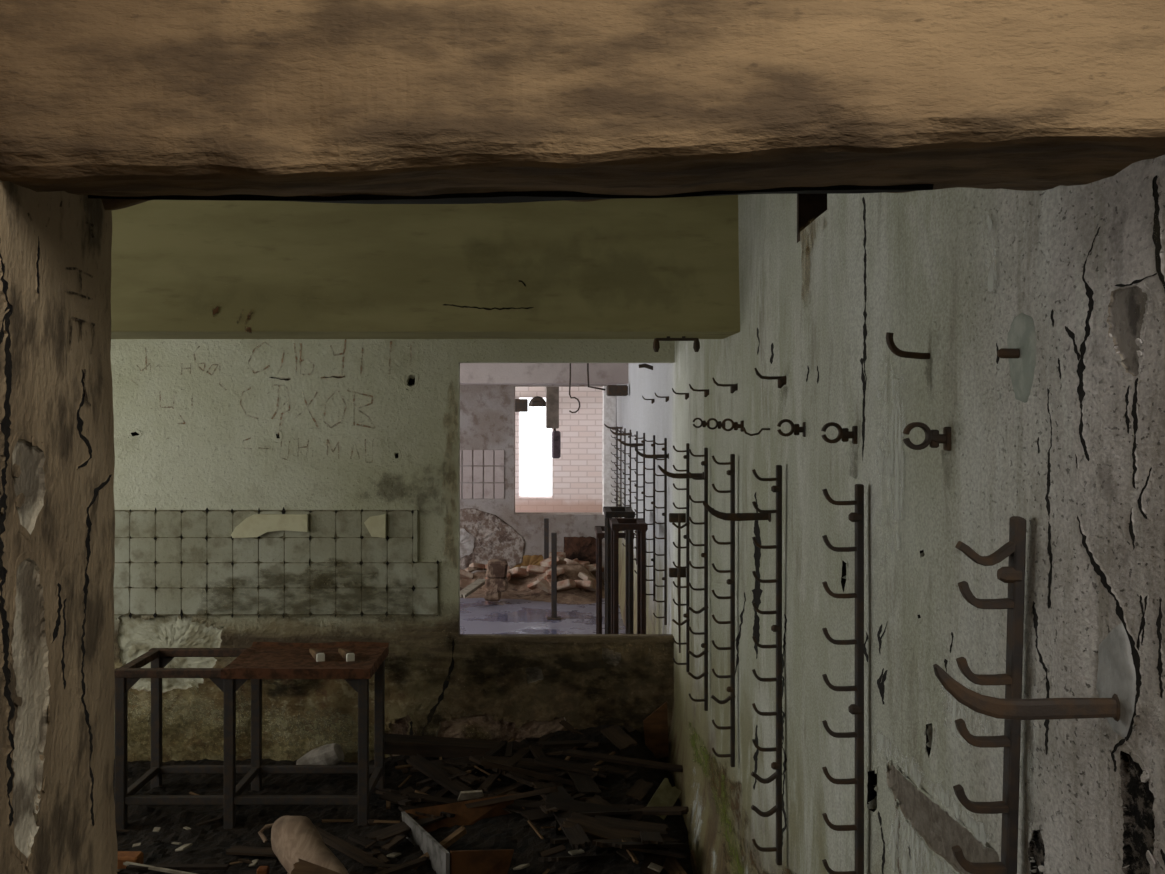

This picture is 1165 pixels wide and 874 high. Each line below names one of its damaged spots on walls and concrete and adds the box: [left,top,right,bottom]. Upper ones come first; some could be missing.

crack [88,184,934,461]
flaking render [1104,276,1152,384]
crack [0,223,40,826]
flaking render [0,431,53,870]
water stain [197,560,414,620]
crack [1032,175,1165,772]
water stain [689,723,769,874]
peeling [866,760,1001,874]
flaking render [1026,823,1047,874]
flaking render [1117,745,1160,874]